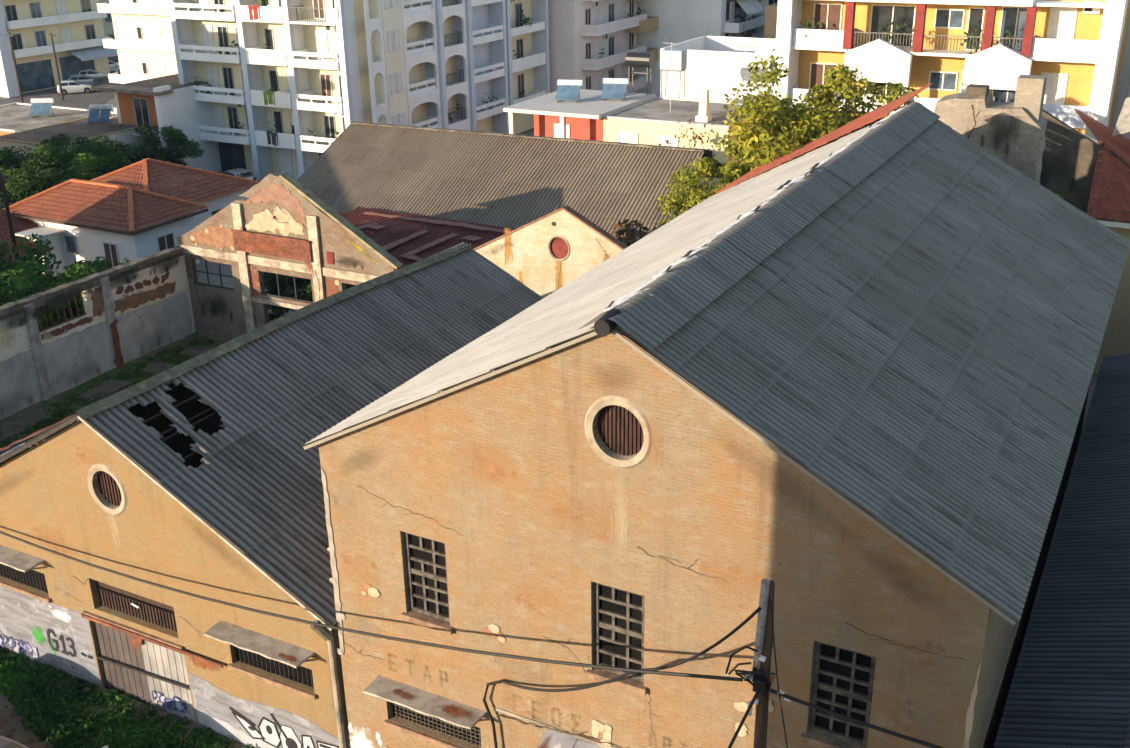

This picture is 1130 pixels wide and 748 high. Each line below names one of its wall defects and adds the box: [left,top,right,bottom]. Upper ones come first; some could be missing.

flaking render [244,182,307,236]
flaking render [189,225,234,251]
flaking render [41,257,192,340]
spalling [249,265,260,296]
crack [358,486,463,536]
crack [637,546,726,582]
crack [845,622,967,661]
peeling [348,723,388,748]
rust [444,706,470,717]
flaking render [734,702,748,736]